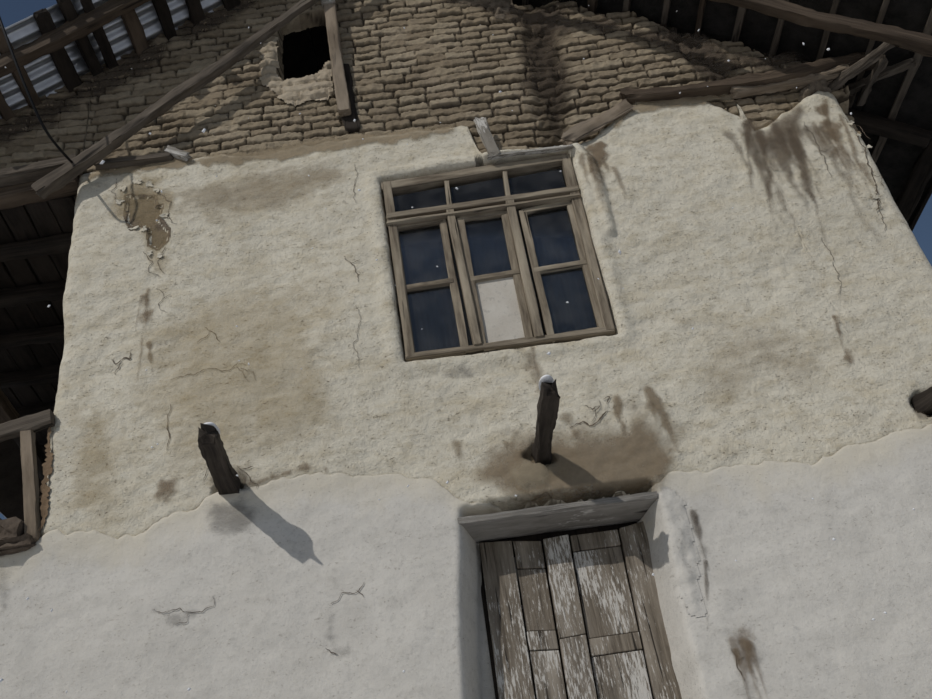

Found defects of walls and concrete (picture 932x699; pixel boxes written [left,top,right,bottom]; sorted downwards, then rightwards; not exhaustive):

water stain [585,141,607,180]
water stain [744,107,813,197]
water stain [816,104,855,156]
crack [843,117,886,230]
spalling [115,178,171,258]
crack [170,363,257,381]
crack [570,396,610,428]
water stain [645,387,670,430]
water stain [483,421,671,506]